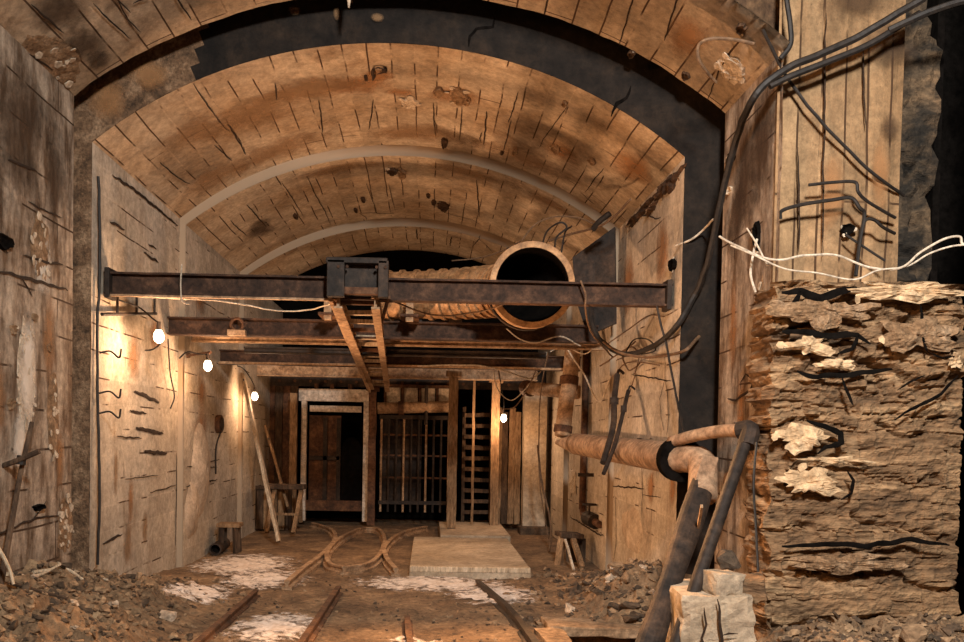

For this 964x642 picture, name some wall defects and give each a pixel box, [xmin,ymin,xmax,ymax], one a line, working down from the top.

spalling [696,34,755,85]
spalling [433,86,471,106]
spalling [625,163,687,230]
spalling [752,442,760,572]
spalling [789,551,909,575]